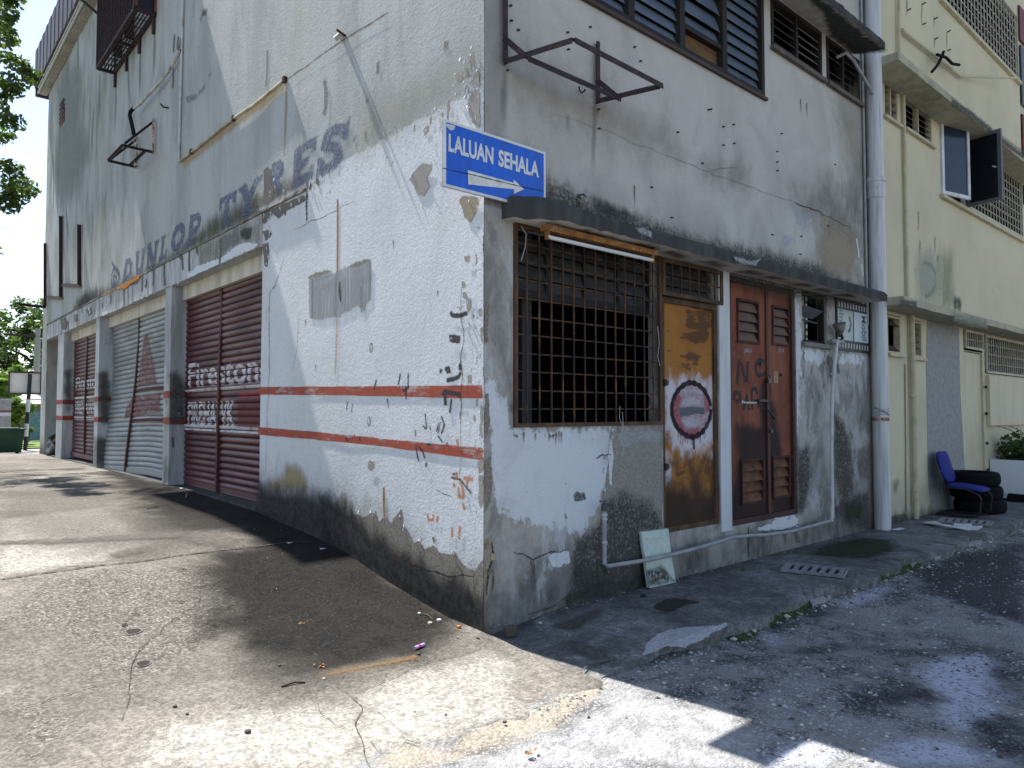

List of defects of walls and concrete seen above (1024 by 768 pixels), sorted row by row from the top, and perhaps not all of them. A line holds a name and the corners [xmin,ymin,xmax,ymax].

leakage [75,287,124,310]
leakage [141,179,307,292]
peeling [409,162,432,196]
peeling [459,196,478,222]
leakage [546,183,691,258]
leakage [704,243,860,303]
peeling [597,429,663,574]
leakage [835,408,869,528]
peeling [350,504,496,631]
crack [514,548,569,575]